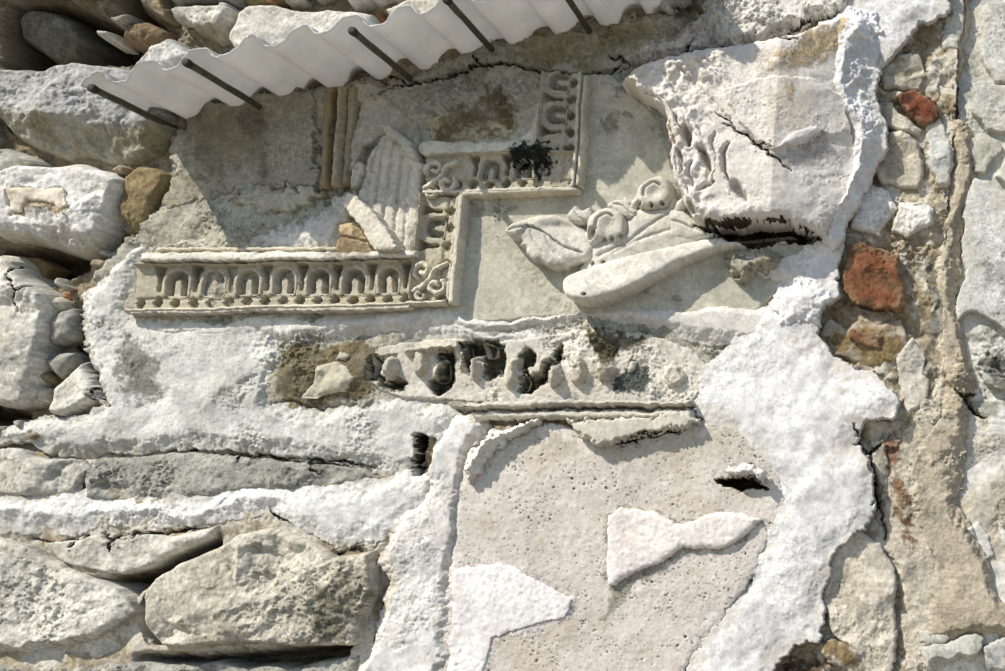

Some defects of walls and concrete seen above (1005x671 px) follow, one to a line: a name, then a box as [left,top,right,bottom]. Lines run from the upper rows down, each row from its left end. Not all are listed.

crack [781,13,837,41]
crack [383,38,724,92]
leakage [519,147,559,182]
crack [716,112,791,170]
spalling [770,125,830,164]
crack [7,266,32,305]
crack [854,424,887,539]
crack [42,524,214,552]
peeling [603,505,765,625]
peeling [440,558,581,671]